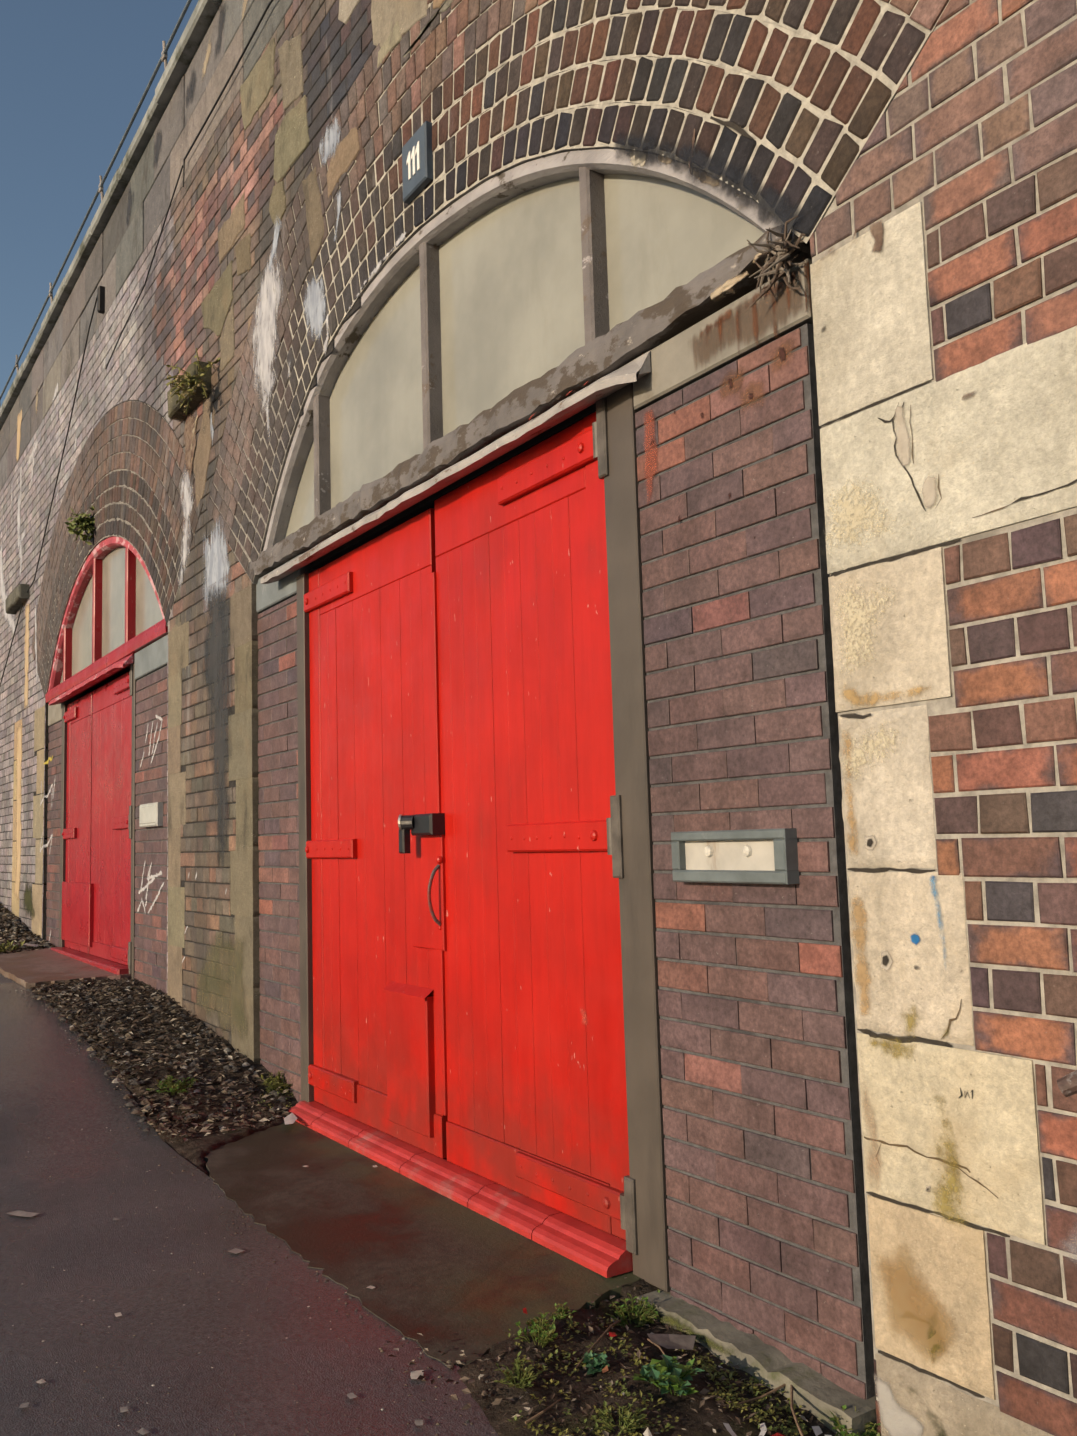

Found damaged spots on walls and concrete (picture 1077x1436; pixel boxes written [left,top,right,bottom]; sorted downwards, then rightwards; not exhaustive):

damp [253,221,290,437]
damp [304,279,328,354]
corrosion [693,260,811,366]
crack [878,402,942,511]
crack [972,479,1077,518]
crack [861,1135,998,1198]